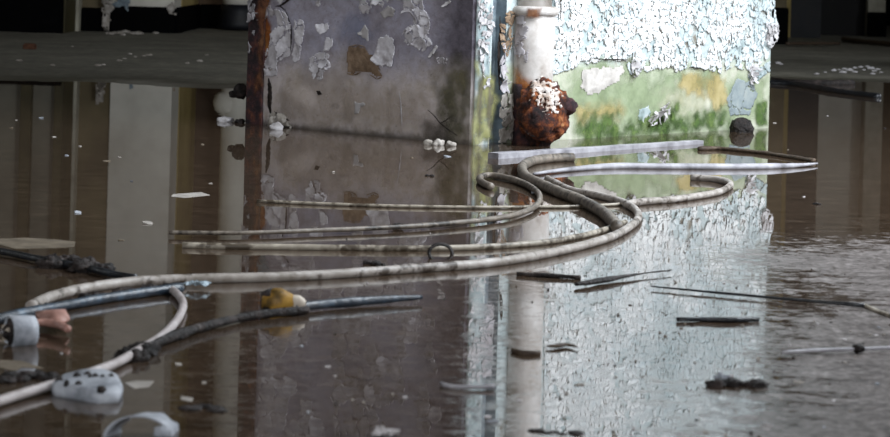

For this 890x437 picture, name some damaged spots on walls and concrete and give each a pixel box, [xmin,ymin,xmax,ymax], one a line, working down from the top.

peeling [101,0,130,31]
corrosion [257,0,271,60]
peeling [246,0,333,95]
peeling [346,0,448,79]
peeling [553,0,780,117]
water stain [667,74,727,110]